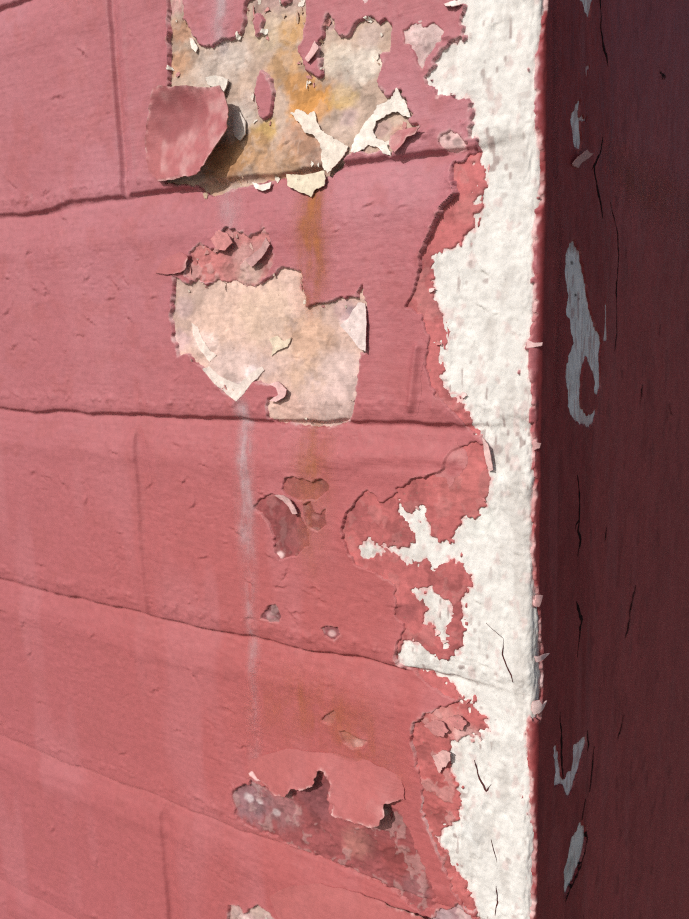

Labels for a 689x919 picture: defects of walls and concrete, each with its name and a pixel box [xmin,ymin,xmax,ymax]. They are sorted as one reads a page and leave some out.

peeling [144,0,420,199]
peeling [570,101,593,168]
crack [600,0,608,64]
peeling [155,227,367,427]
peeling [565,241,606,427]
crack [592,140,619,348]
peeling [230,0,550,919]
crack [574,475,582,554]
peeling [554,736,585,796]
peeling [564,822,584,892]